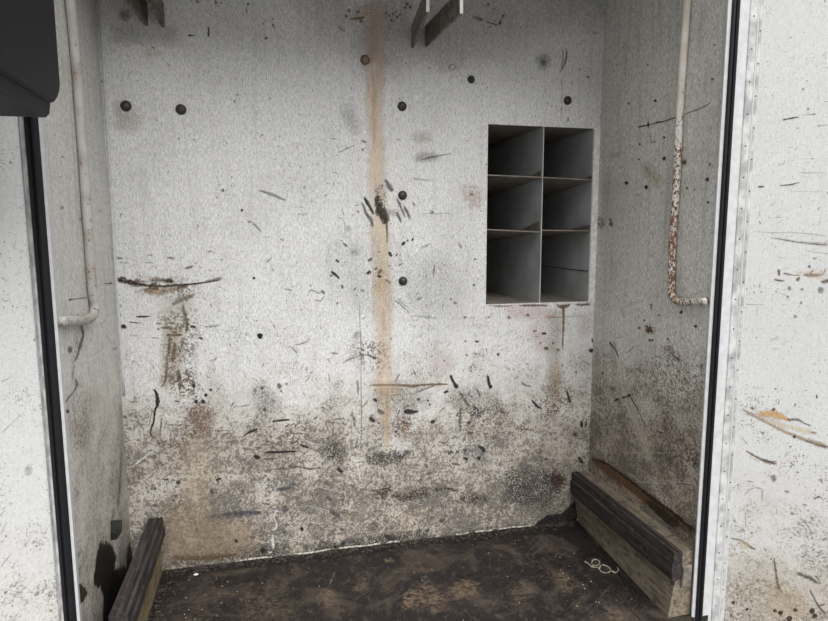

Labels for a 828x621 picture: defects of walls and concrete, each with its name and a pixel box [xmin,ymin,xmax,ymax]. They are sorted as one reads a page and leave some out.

rust [140,278,212,446]
leakage [210,511,261,519]
leakage [393,488,487,503]
leakage [171,526,548,575]